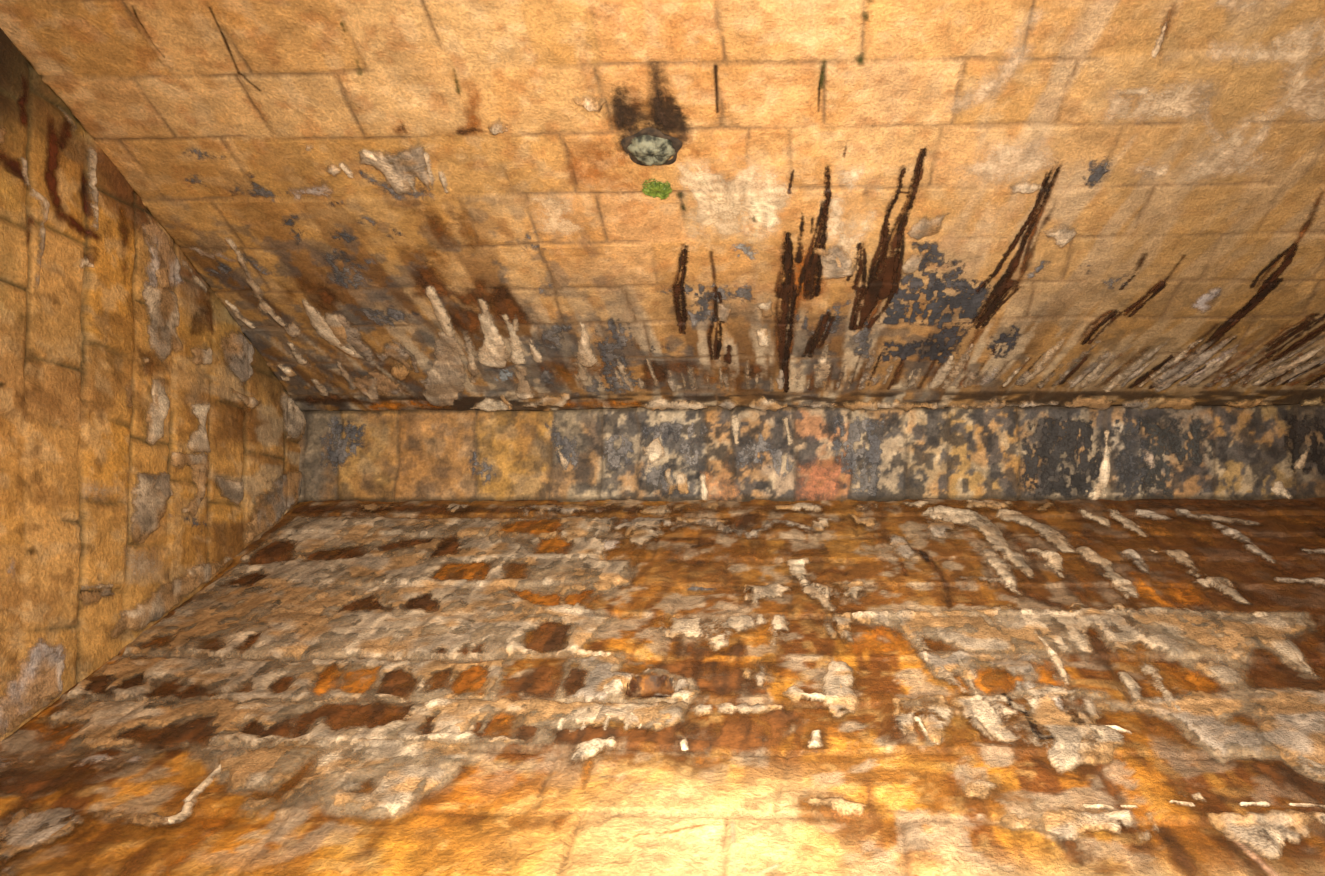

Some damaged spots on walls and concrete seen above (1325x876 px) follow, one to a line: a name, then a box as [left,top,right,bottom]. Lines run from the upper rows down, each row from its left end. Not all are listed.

damp [613,66,687,154]
damp [0,116,99,284]
damp [230,175,343,206]
damp [359,147,448,201]
damp [120,208,439,445]
damp [412,211,529,334]
damp [130,403,244,543]
damp [320,417,365,469]
damp [469,451,495,485]
damp [470,396,512,412]
damp [524,145,1325,876]
damp [0,471,864,876]